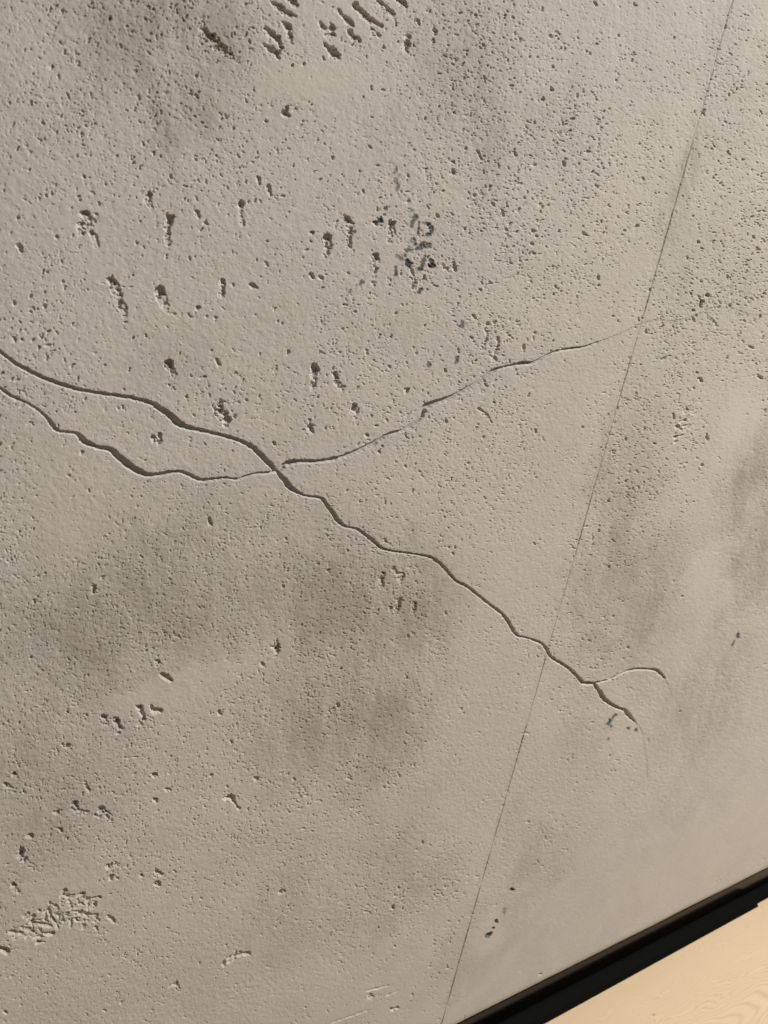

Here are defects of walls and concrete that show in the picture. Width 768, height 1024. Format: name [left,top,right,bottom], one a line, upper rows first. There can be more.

crack [0,306,768,778]